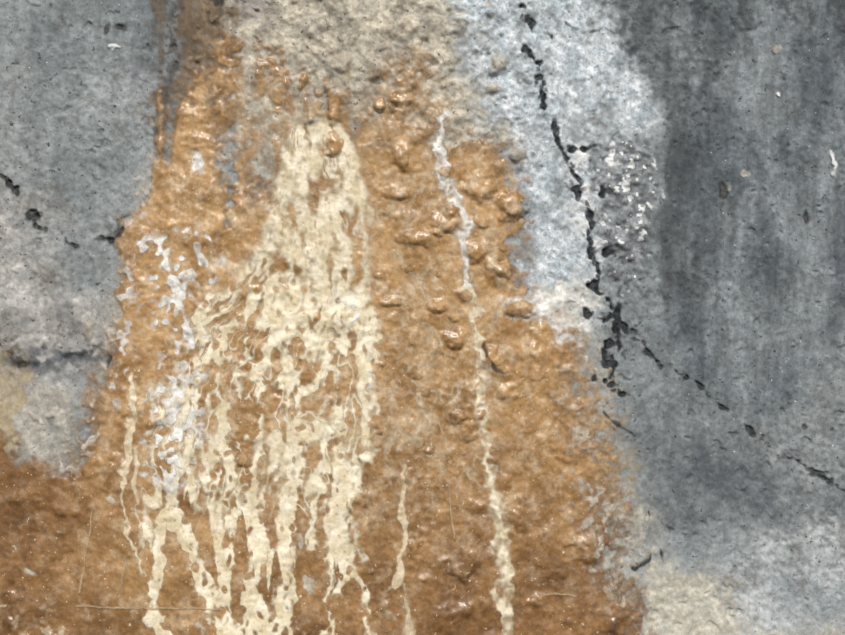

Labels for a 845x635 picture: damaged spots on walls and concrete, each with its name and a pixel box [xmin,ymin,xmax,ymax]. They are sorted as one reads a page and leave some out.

leakage [0,120,384,635]
corrosion [0,0,645,635]
leakage [430,111,515,635]
crack [482,342,506,374]
crack [519,4,662,397]
leakage [449,0,741,635]
crack [684,376,728,411]
crack [796,460,832,484]